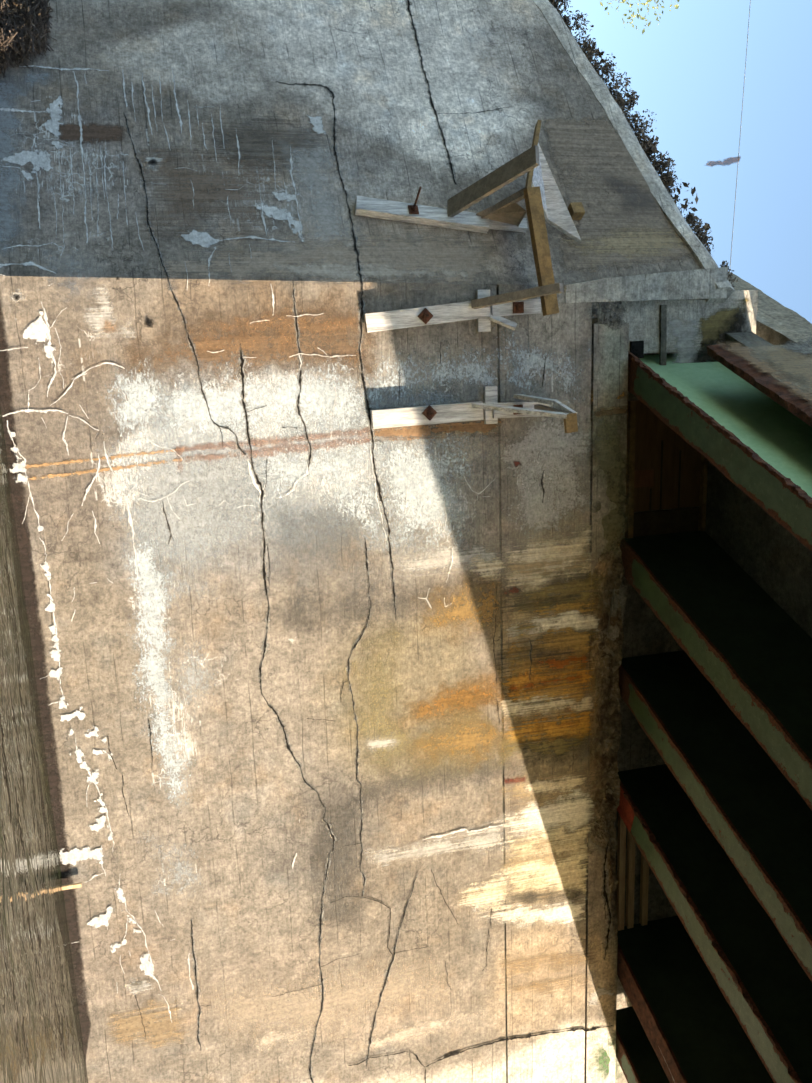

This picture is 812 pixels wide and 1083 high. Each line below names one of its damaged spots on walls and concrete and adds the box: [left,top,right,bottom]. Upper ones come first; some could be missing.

damp [0,65,144,276]
damp [122,69,492,323]
corrosion [25,418,502,480]
crack [124,81,458,1083]
damp [0,302,632,1079]
corrosion [355,627,599,764]
spalling [587,529,626,943]
crack [601,842,612,960]